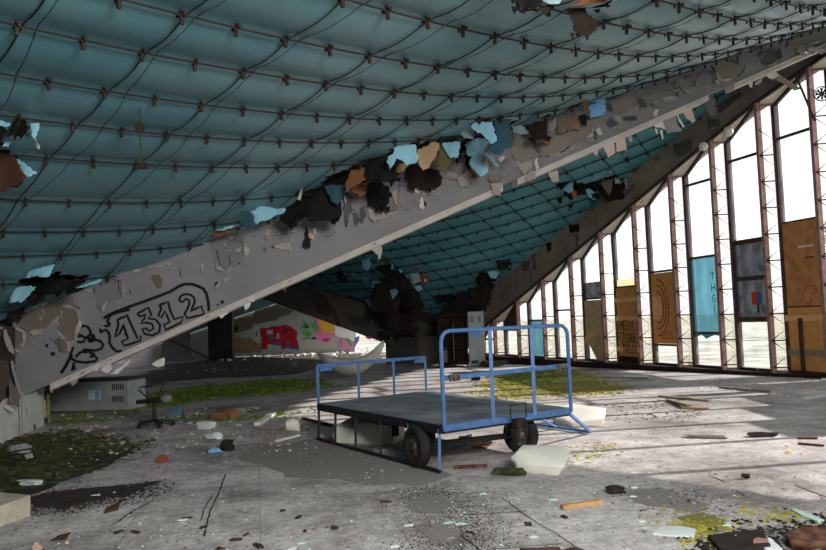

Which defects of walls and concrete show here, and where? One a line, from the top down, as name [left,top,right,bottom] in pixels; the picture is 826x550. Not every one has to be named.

spalling [749,47,783,88]
spalling [638,90,742,158]
spalling [488,102,638,196]
peeling [344,190,399,227]
peeling [415,187,441,210]
spalling [263,215,316,251]
spalling [86,275,125,312]
peeling [66,359,131,386]
crack [200,474,226,537]